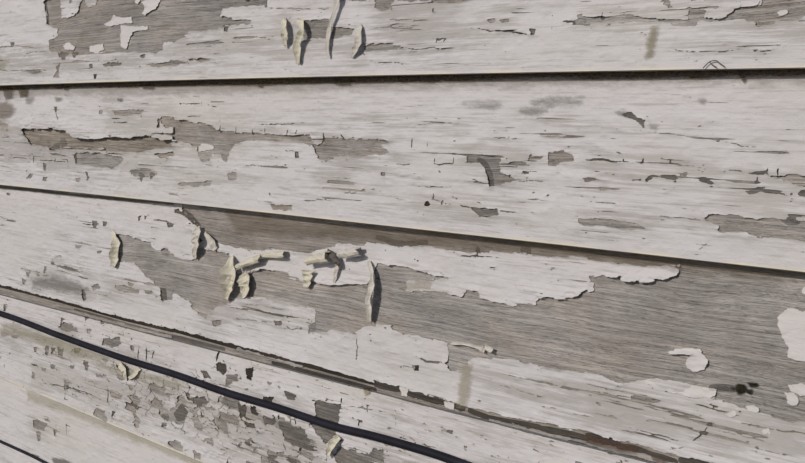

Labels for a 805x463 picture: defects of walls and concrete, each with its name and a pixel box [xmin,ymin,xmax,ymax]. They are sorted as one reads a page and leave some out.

peeling [352,0,464,11]
peeling [576,0,805,29]
peeling [44,0,401,77]
peeling [22,116,389,182]
peeling [465,154,514,186]
spalling [528,150,574,166]
spalling [646,172,719,187]
spalling [729,168,805,197]
spalling [22,259,107,301]
peeling [83,204,805,463]
spalling [32,346,64,379]
spalling [33,417,68,441]